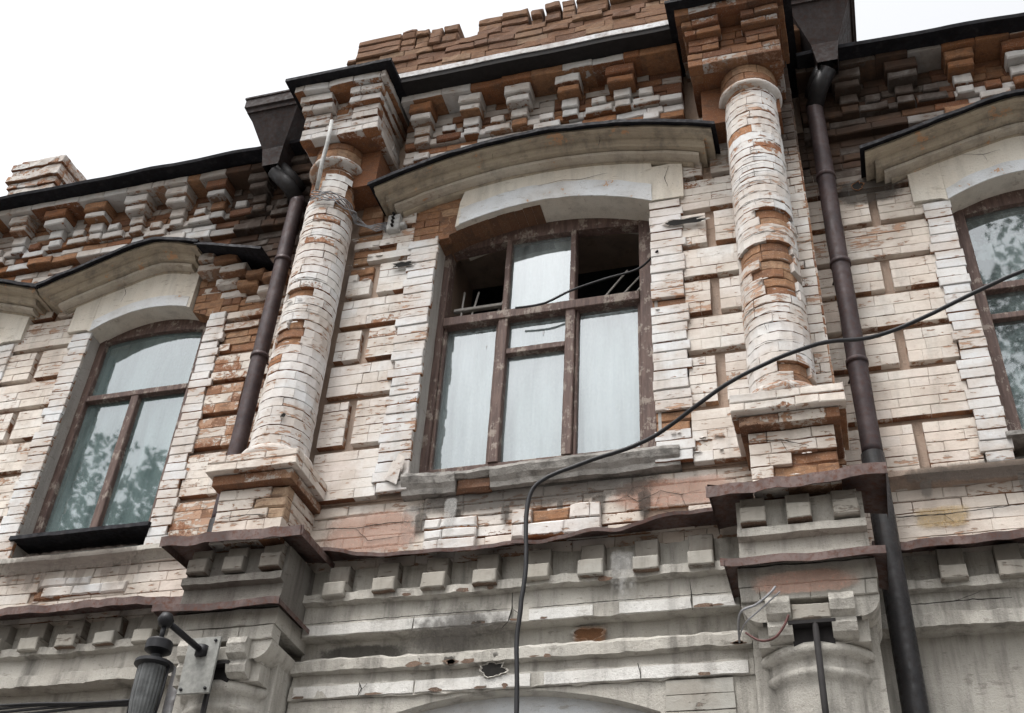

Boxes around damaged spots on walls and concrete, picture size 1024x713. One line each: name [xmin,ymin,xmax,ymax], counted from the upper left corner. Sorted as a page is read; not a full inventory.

spalling [306,167,397,282]
spalling [738,208,804,297]
spalling [193,253,272,323]
spalling [281,269,314,304]
spalling [222,327,258,354]
spalling [270,321,305,348]
spalling [777,363,814,384]